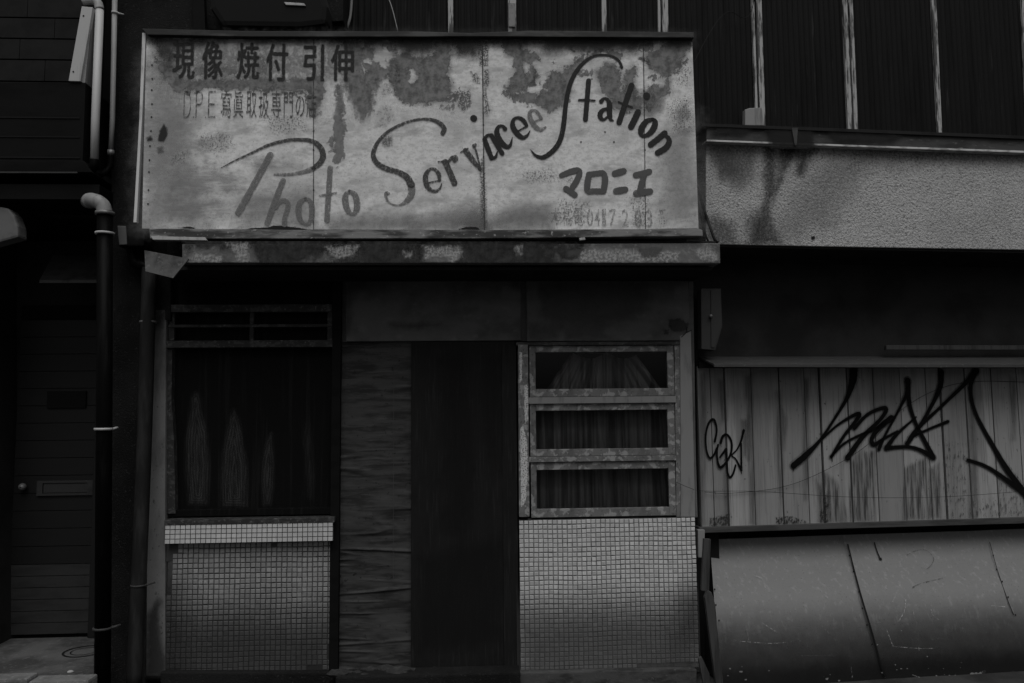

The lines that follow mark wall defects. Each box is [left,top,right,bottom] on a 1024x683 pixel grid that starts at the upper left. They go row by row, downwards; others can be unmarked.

water stain [715,147,815,243]